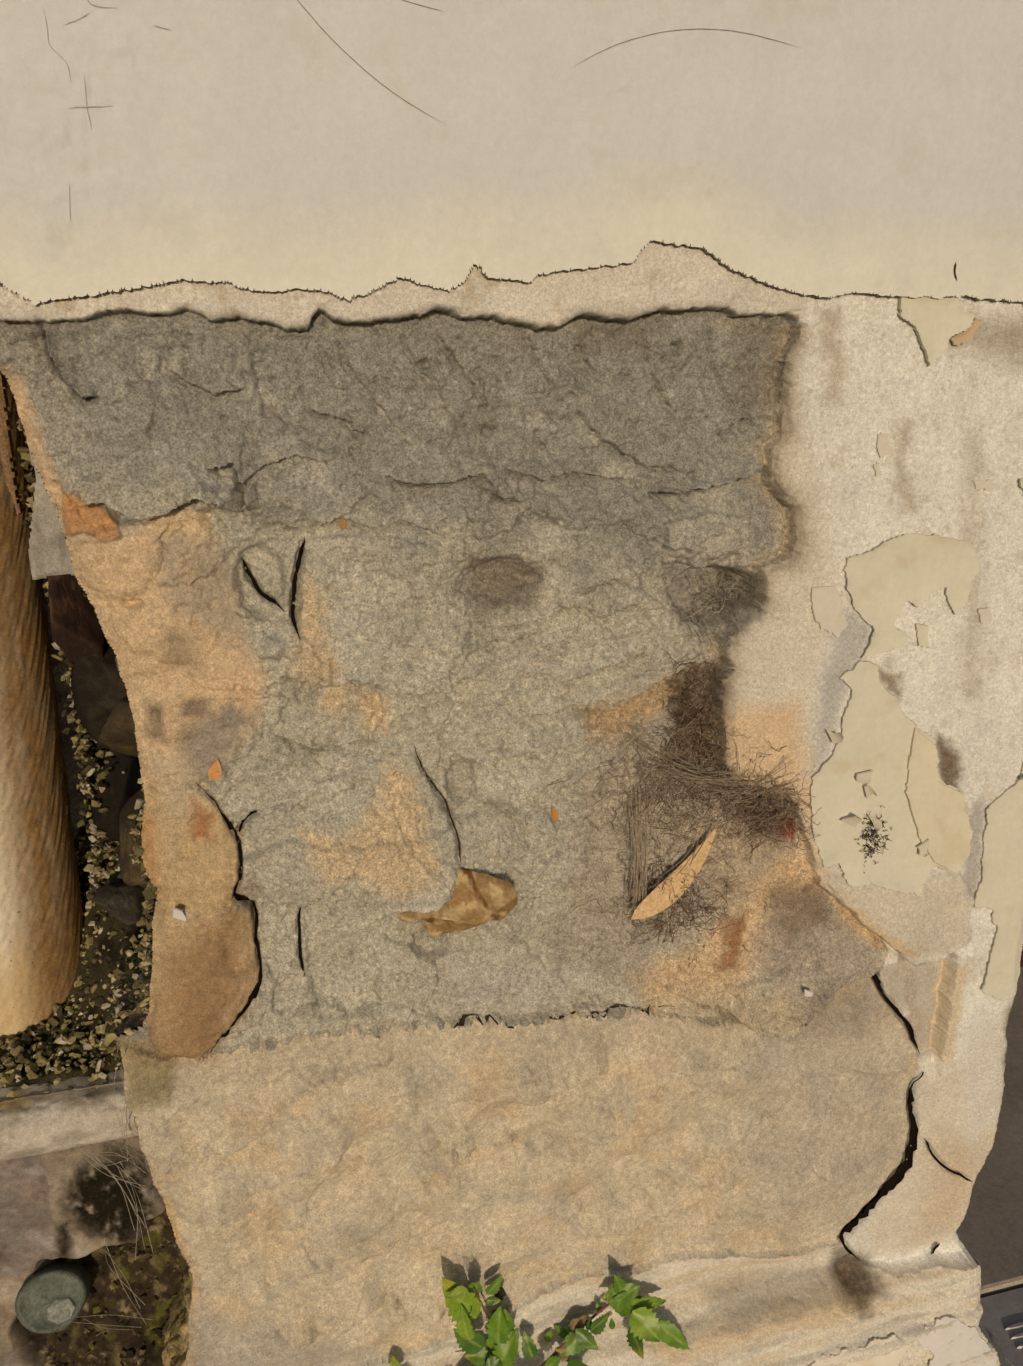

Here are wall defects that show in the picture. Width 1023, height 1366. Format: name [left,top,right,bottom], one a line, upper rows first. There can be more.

peeling [898,296,982,366]
crack [242,538,305,639]
spalling [0,308,1023,1062]
crack [198,784,262,1053]
crack [297,908,305,975]
crack [839,972,973,1258]